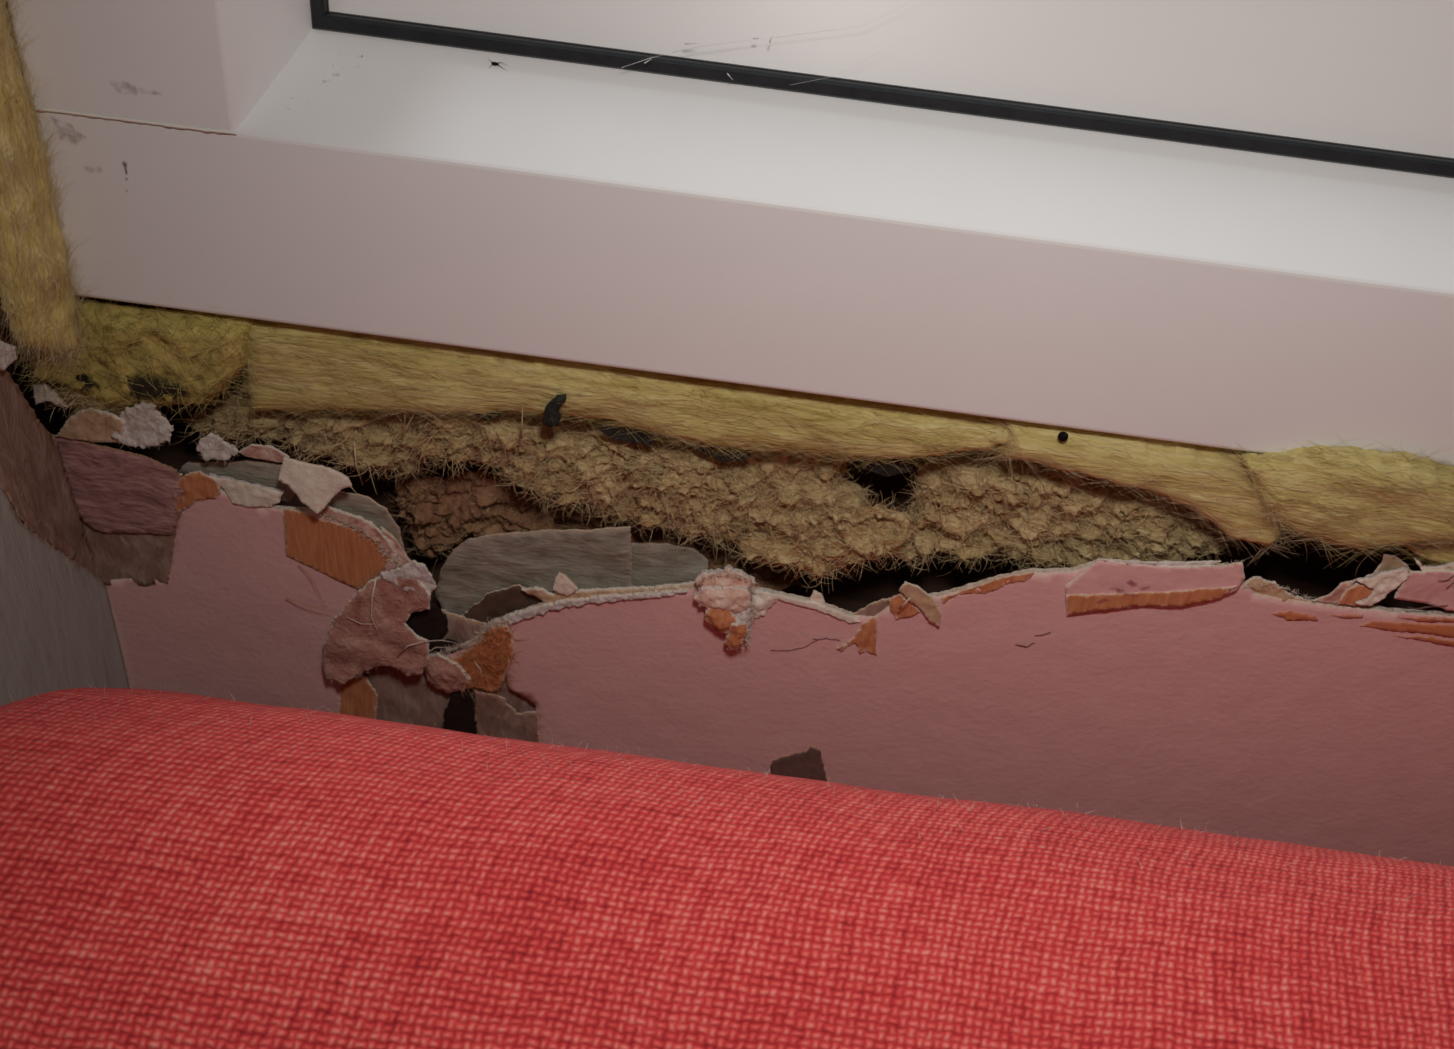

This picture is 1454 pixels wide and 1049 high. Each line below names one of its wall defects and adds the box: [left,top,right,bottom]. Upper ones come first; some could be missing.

peeling [278,457,352,514]
peeling [553,571,578,596]
peeling [809,590,827,606]
peeling [1065,558,1245,616]
peeling [1312,554,1454,611]
spalling [836,598,890,656]
spalling [770,746,829,782]